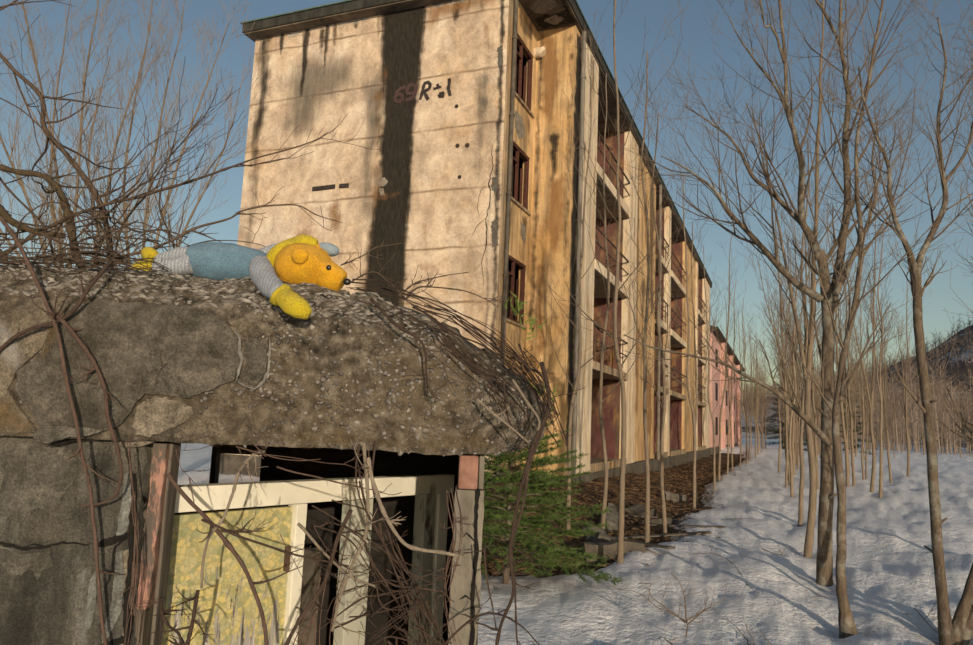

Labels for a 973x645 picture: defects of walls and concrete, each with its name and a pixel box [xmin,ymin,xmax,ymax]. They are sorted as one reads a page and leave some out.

leakage [254,34,284,154]
leakage [294,25,344,126]
rust [543,38,558,117]
leakage [360,6,426,306]
peeling [0,297,269,536]
crack [0,473,137,645]
peeling [84,571,97,632]
peeling [101,549,129,645]